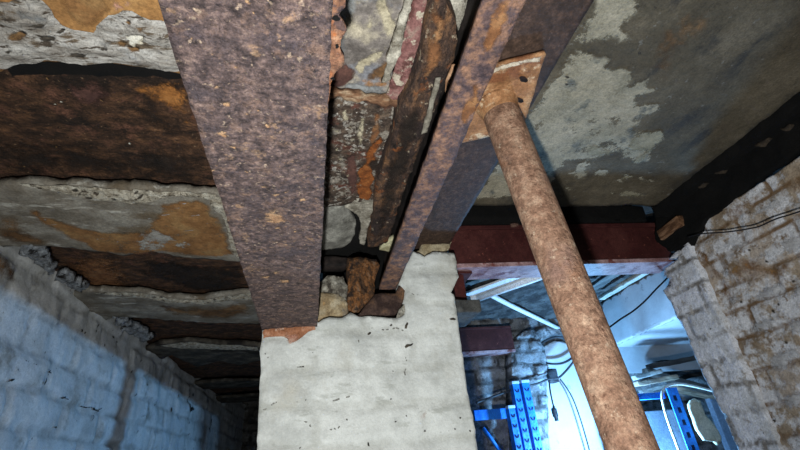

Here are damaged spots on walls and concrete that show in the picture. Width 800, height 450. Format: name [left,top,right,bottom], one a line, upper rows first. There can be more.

corrosion [328,0,347,102]
corrosion [368,62,387,80]
corrosion [424,9,444,76]
corrosion [484,3,508,51]
corrosion [137,83,187,110]
corrosion [265,209,285,229]